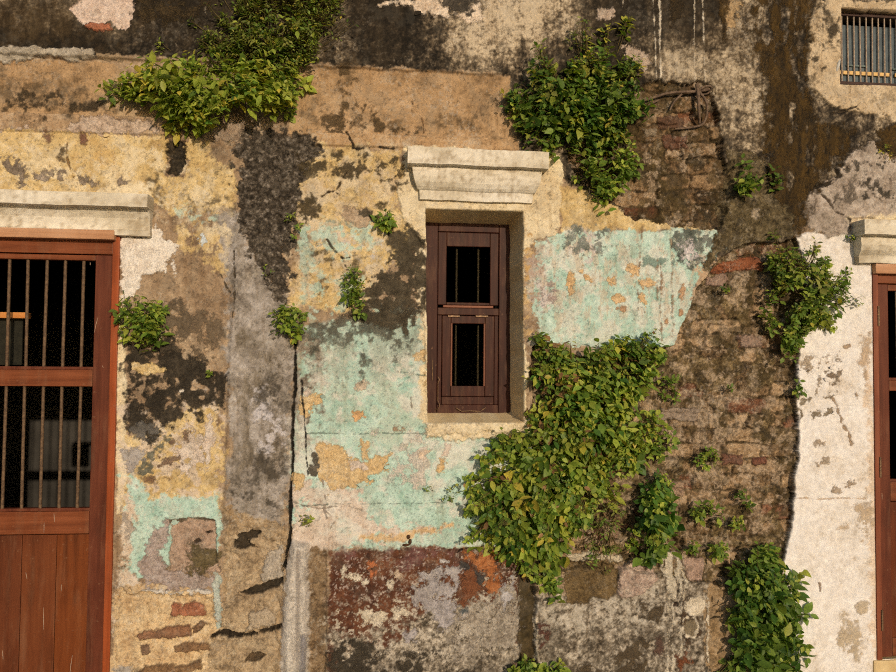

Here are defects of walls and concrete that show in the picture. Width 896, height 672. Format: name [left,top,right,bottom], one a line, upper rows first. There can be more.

flaking render [69,0,135,32]
flaking render [378,0,484,24]
peeling [597,7,615,20]
water stain [653,0,704,80]
water stain [719,0,730,43]
water stain [748,0,896,244]
water stain [296,149,408,191]
water stain [297,192,322,224]
peeling [119,225,180,304]
flaking render [538,43,842,605]
peeling [290,428,452,495]
flaking render [113,517,286,672]